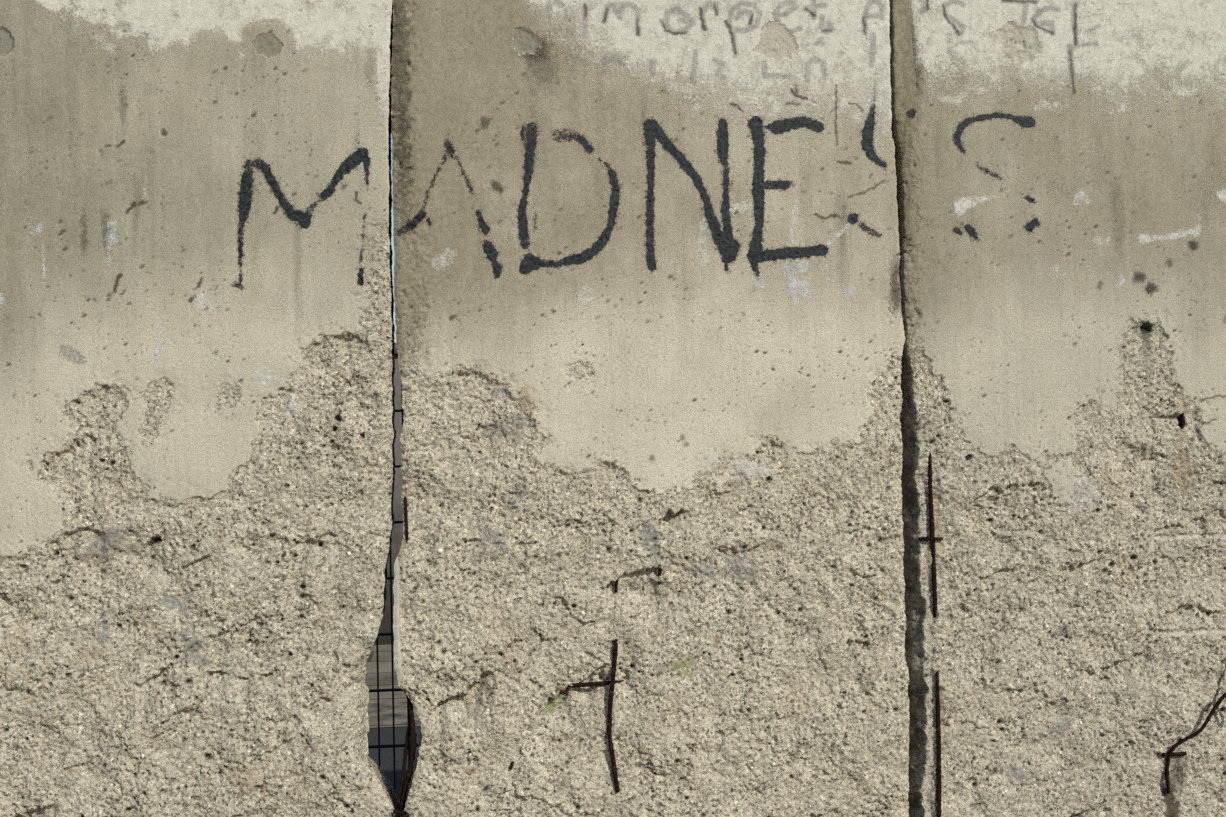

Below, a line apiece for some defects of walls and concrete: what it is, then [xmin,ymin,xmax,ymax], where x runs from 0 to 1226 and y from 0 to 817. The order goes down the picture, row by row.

spalling [0,222,1226,817]
corrosion [1162,765,1183,817]